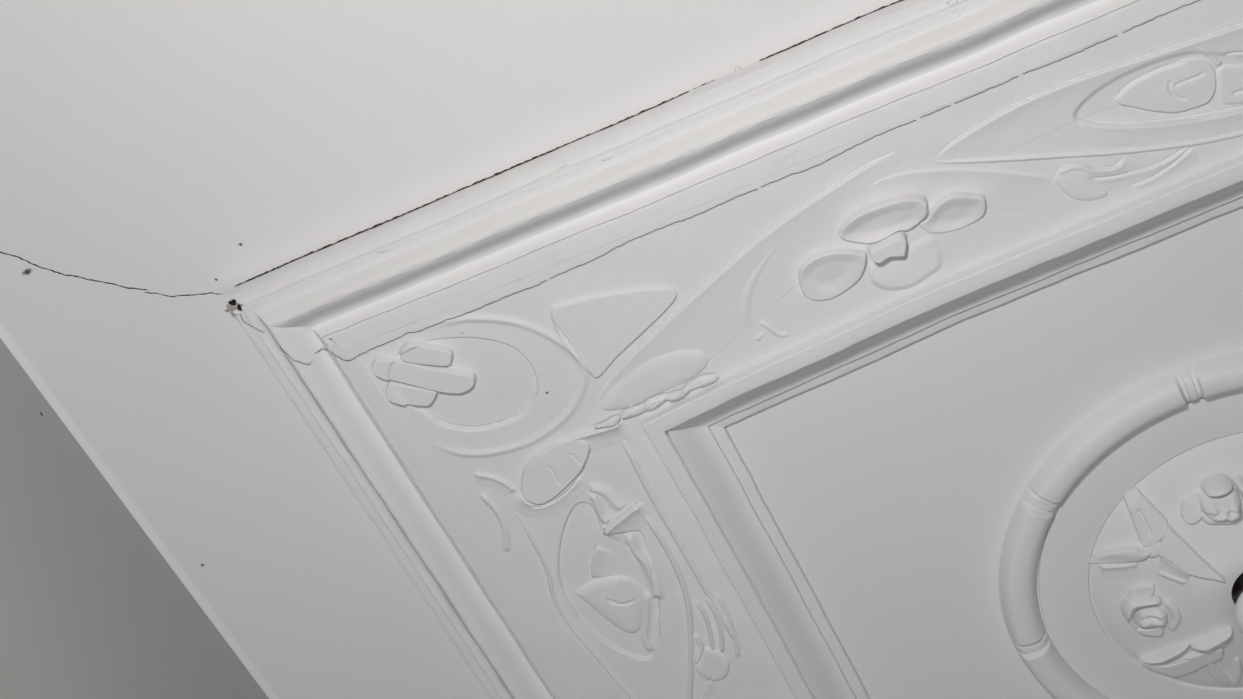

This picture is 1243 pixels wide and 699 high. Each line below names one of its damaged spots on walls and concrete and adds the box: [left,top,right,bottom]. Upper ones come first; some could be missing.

crack [0,0,1199,364]